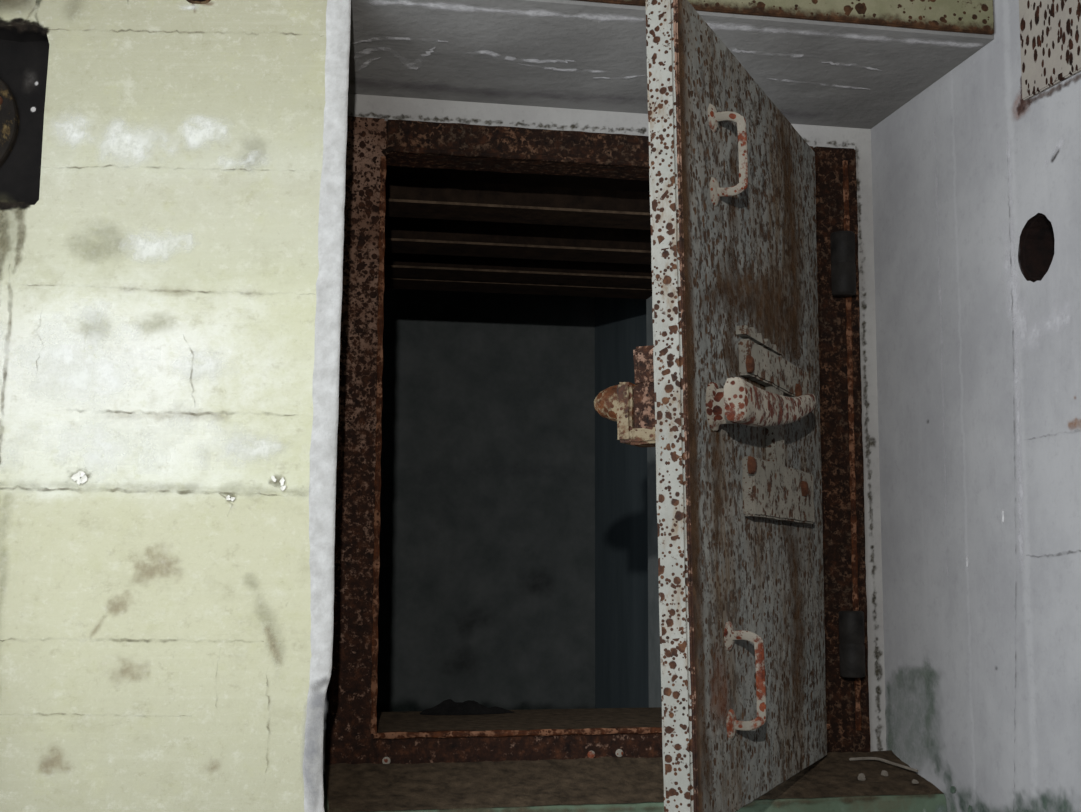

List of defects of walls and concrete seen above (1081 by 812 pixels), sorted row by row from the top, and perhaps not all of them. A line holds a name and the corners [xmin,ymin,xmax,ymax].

rust [681,169,702,600]
rust [725,308,765,390]